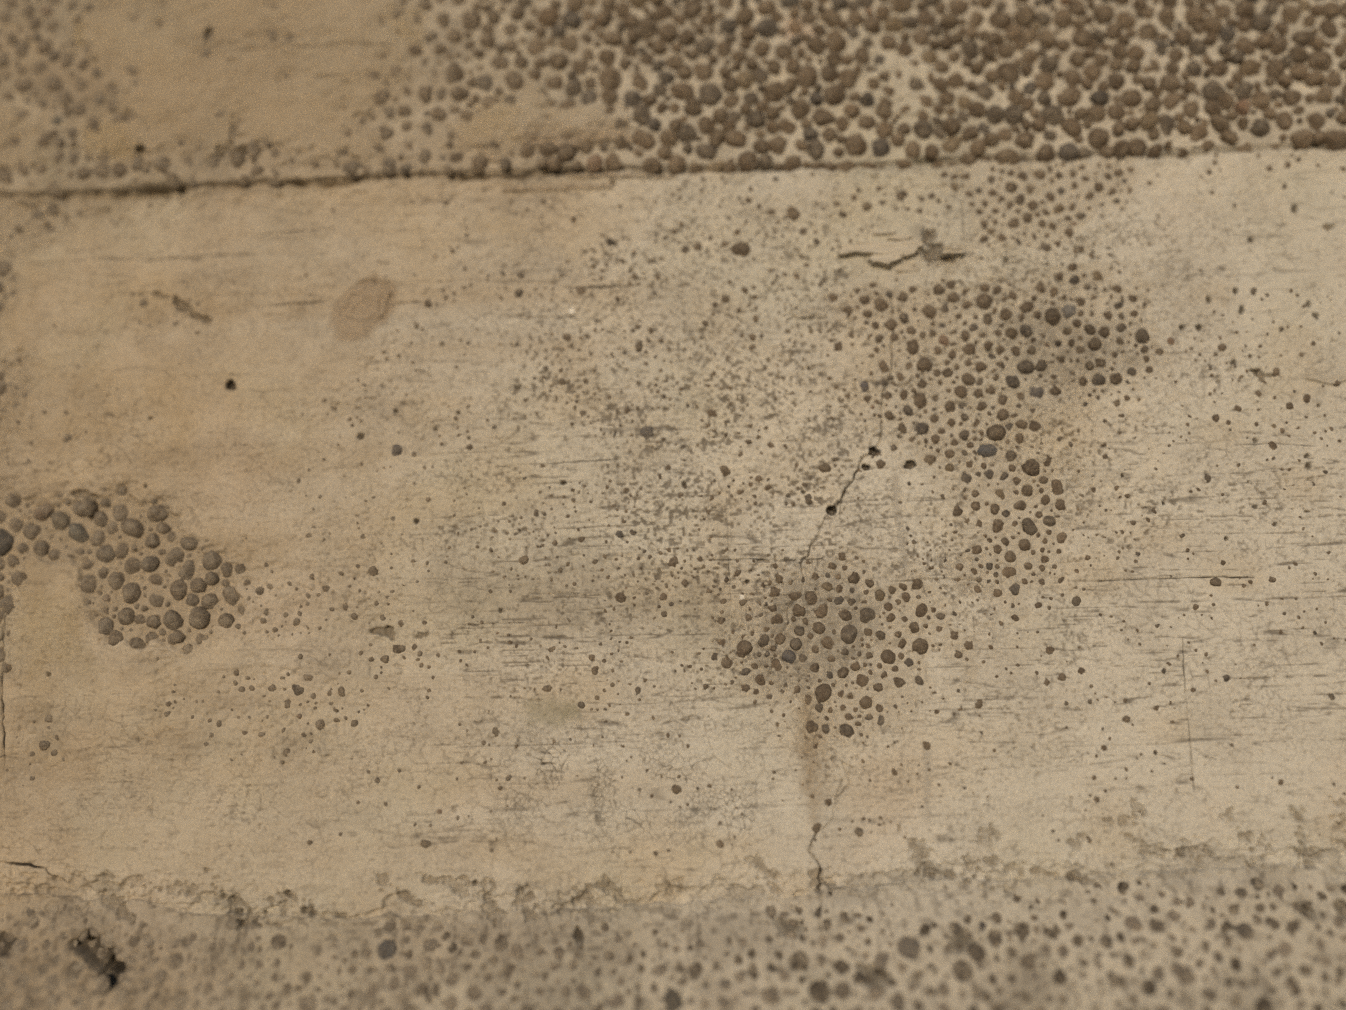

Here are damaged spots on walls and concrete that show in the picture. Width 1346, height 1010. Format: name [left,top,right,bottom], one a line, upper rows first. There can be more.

crack [834,432,881,508]
crack [810,833,822,891]